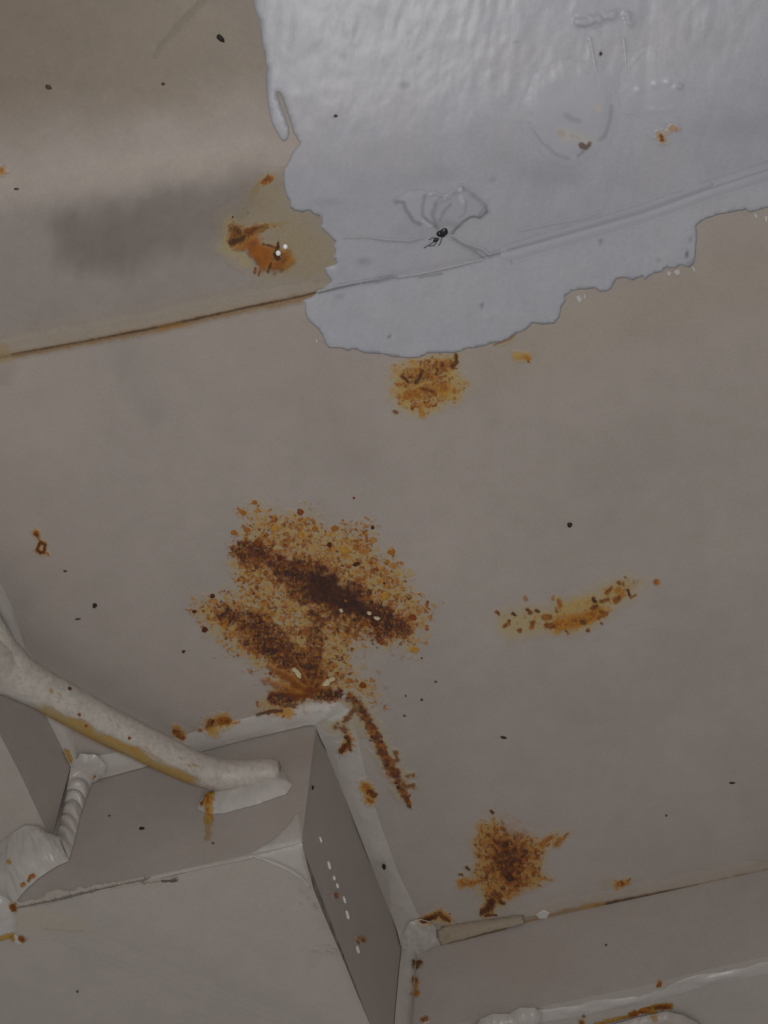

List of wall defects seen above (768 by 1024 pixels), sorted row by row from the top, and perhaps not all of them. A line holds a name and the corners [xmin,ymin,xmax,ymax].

corrosion [0,168,337,385]
corrosion [382,349,477,425]
corrosion [29,526,52,558]
corrosion [487,566,663,648]
corrosion [167,490,446,810]
corrosion [200,791,215,825]
corrosion [451,806,768,923]